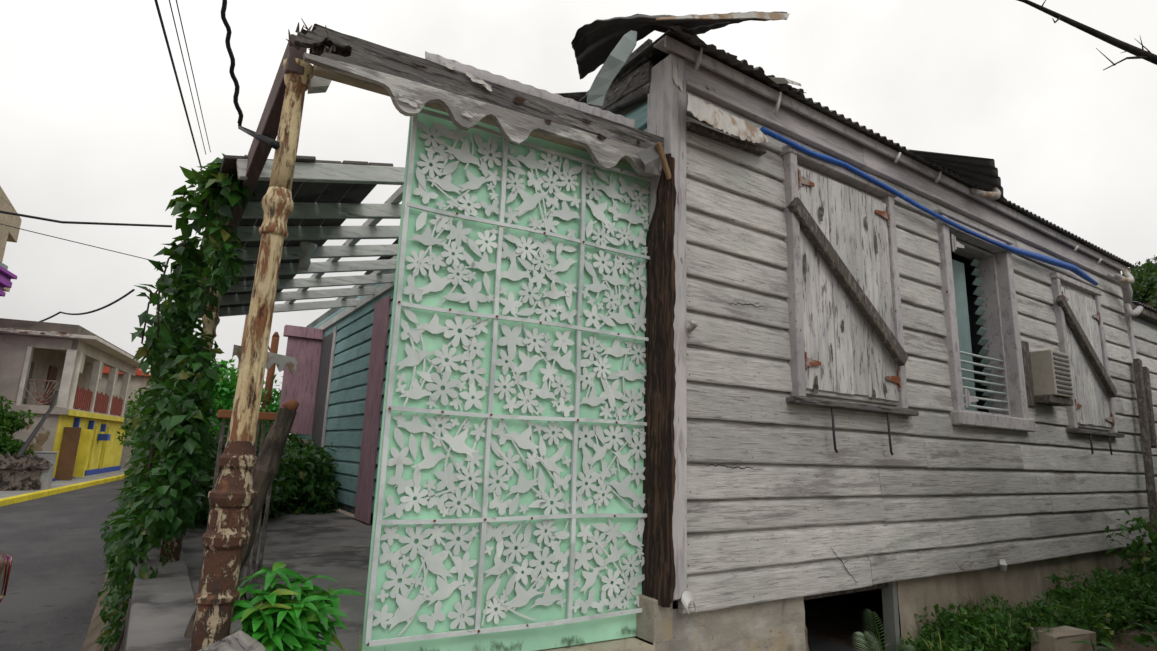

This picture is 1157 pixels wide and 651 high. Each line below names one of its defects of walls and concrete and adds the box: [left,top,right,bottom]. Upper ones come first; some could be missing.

spalling [309,23,350,57]